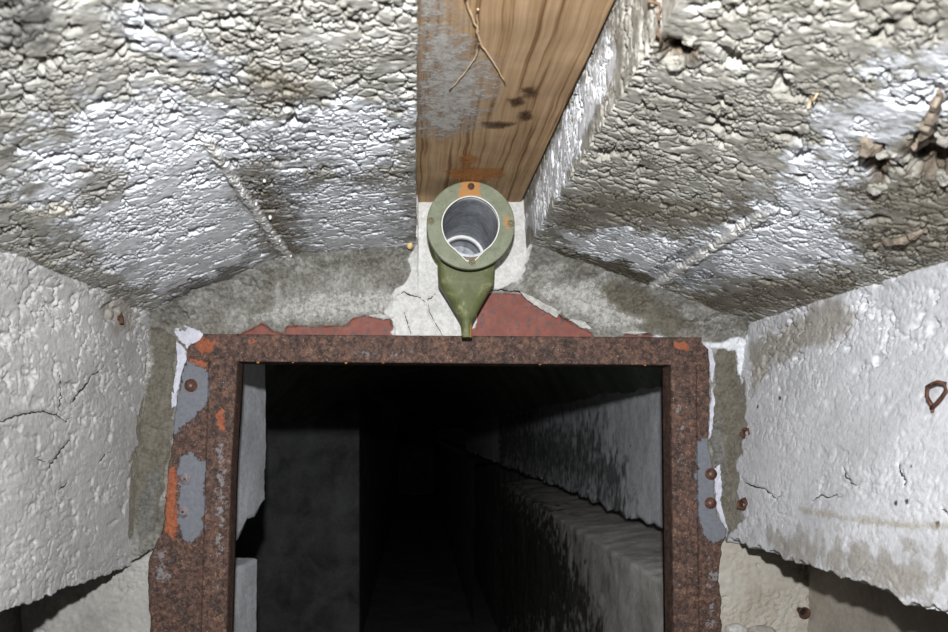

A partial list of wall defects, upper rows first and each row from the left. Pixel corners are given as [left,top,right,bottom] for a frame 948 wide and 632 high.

spalling [866,131,948,196]
spalling [241,313,394,335]
crack [398,291,443,336]
spalling [472,291,593,337]
peeling [171,325,203,408]
crack [0,366,104,490]
crack [812,468,855,502]